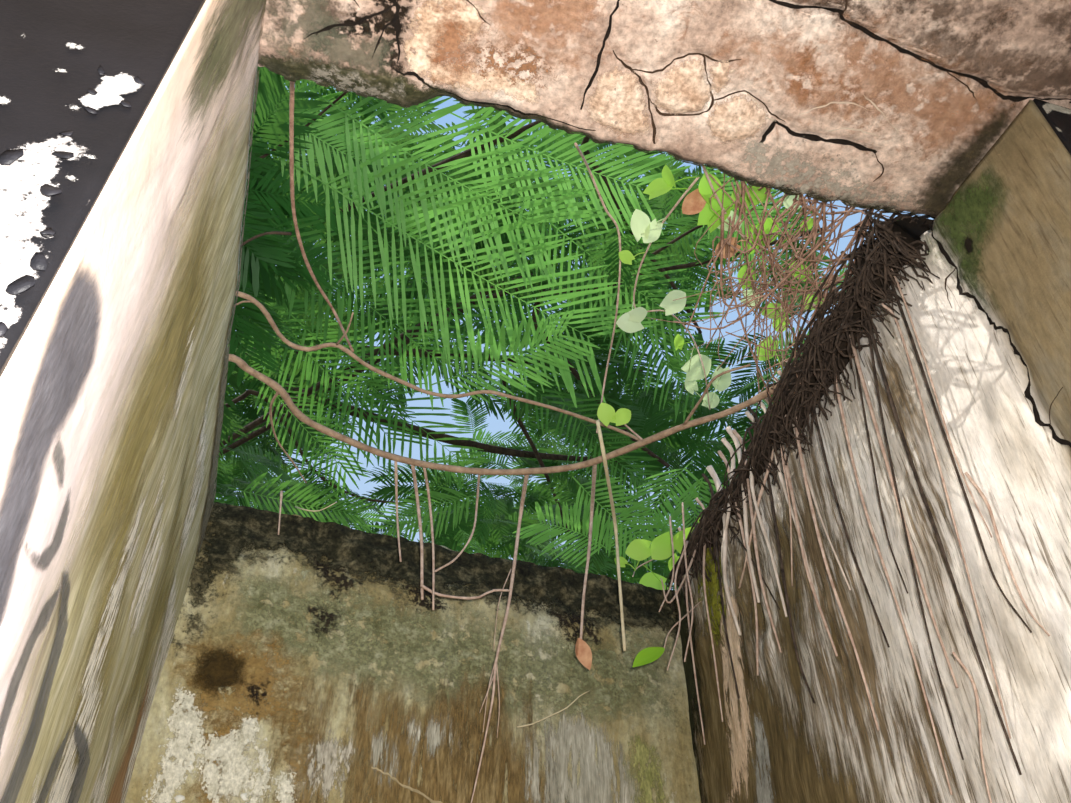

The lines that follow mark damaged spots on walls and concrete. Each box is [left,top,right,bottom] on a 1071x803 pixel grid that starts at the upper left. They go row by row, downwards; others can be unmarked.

peeling [70,65,145,114]
crack [303,0,884,182]
crack [769,0,1071,103]
peeling [0,130,95,348]
leakage [293,683,332,803]
leakage [345,671,640,803]